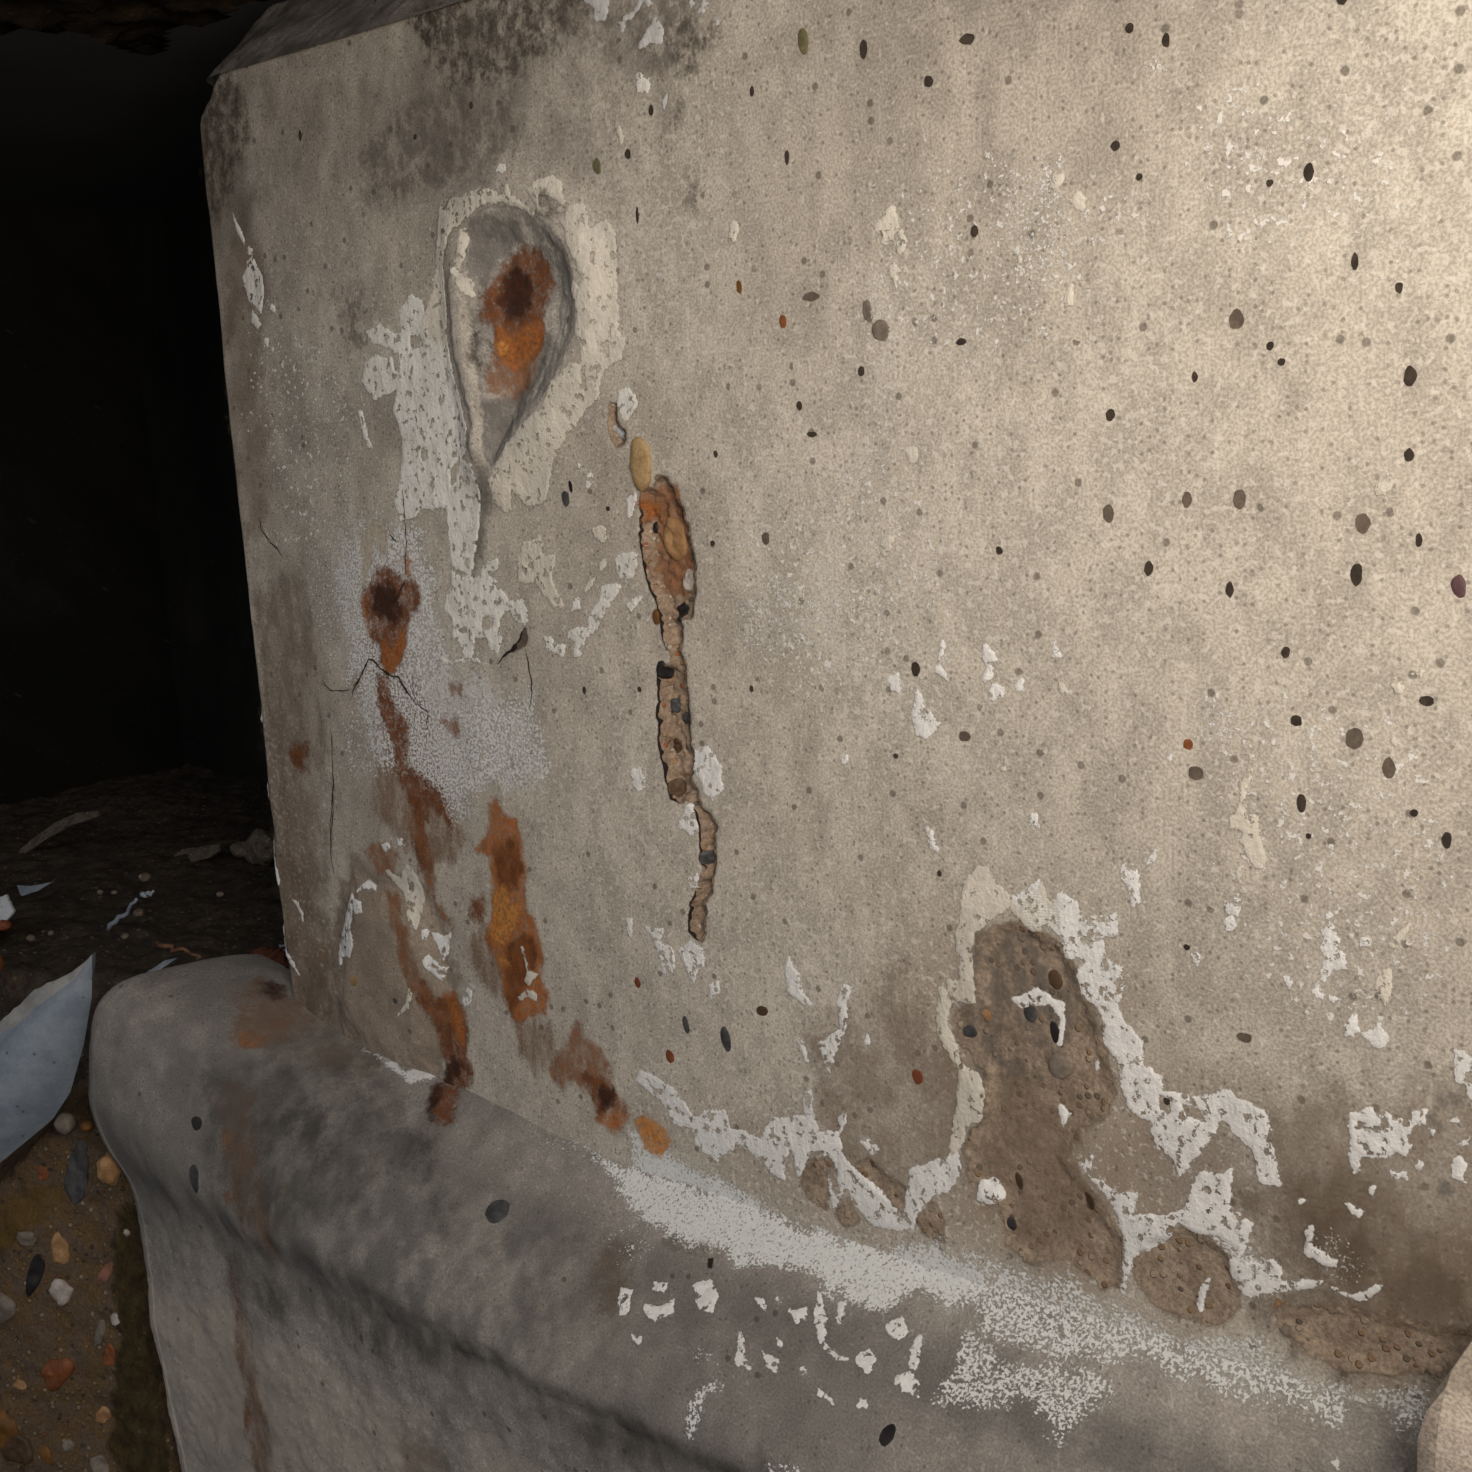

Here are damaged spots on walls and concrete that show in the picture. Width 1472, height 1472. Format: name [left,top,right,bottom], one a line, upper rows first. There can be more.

water stain [415,0,574,81]
rust [479,246,555,399]
peeling [358,163,725,1003]
crack [322,659,428,726]
crack [327,730,335,873]
rust [361,521,473,1125]
peeling [338,838,452,981]
rust [468,798,670,1156]
water stain [359,1047,436,1084]
peeling [636,849,1472,1378]
peeling [885,1316,923,1398]
water stain [531,1129,1430,1448]